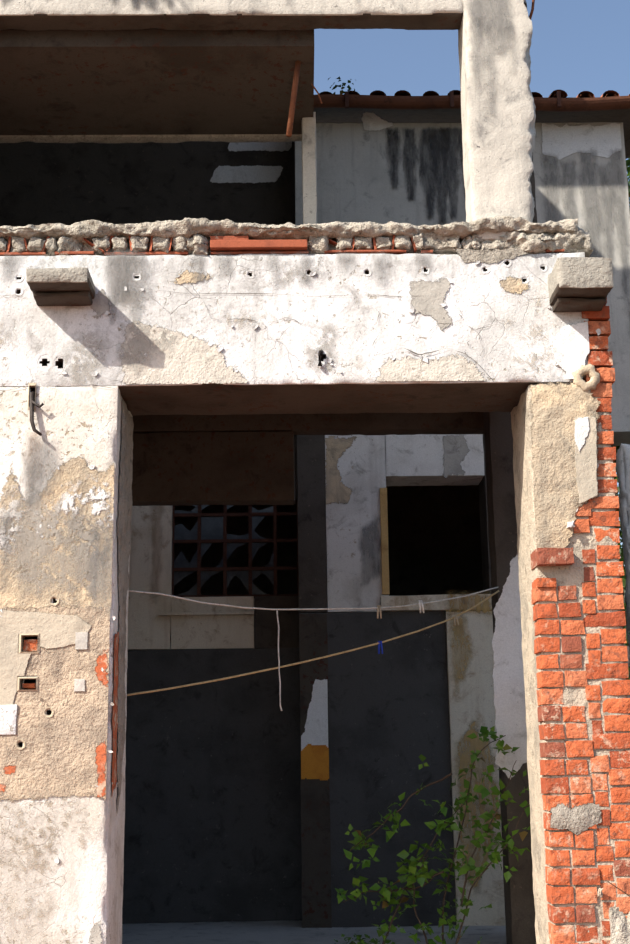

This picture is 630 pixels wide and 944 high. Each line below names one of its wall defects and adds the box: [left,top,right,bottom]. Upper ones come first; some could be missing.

leakage [471,0,509,46]
corrosion [286,61,301,137]
leakage [387,128,463,224]
spalling [309,236,329,255]
spalling [420,227,594,264]
flaking render [121,321,247,384]
crack [120,282,302,338]
flaking render [409,278,453,331]
crack [373,294,507,380]
flaking render [325,436,357,504]
flaking render [529,381,601,548]
flaking render [0,399,134,813]